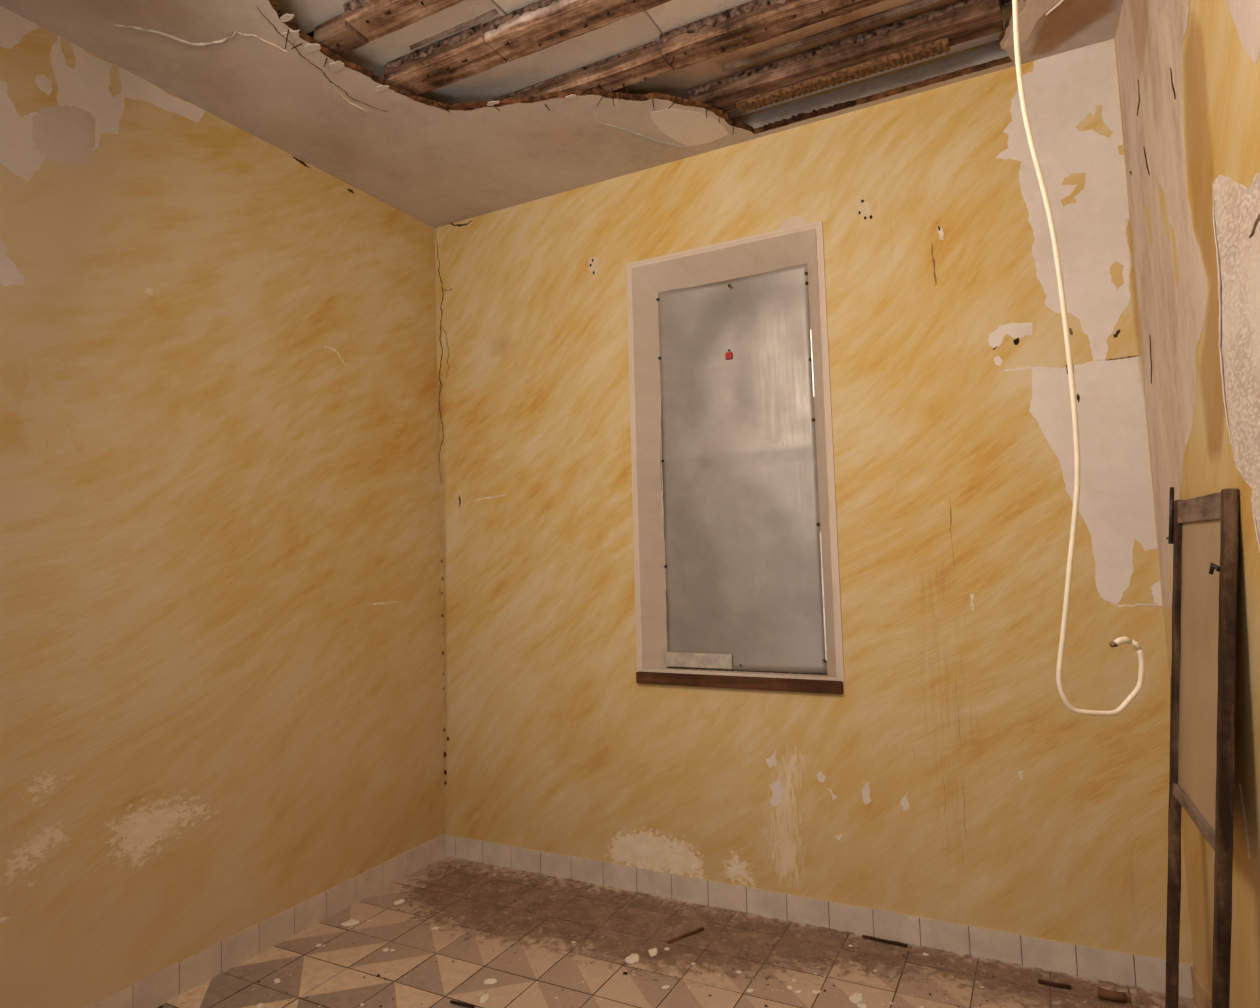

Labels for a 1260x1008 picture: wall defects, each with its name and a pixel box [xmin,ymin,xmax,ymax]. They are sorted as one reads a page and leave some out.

peeling [0,80,46,181]
peeling [0,6,206,151]
spalling [269,0,733,147]
spalling [764,100,855,130]
peeling [0,237,25,286]
peeling [988,0,1260,609]
peeling [597,726,842,898]
peeling [862,782,871,805]